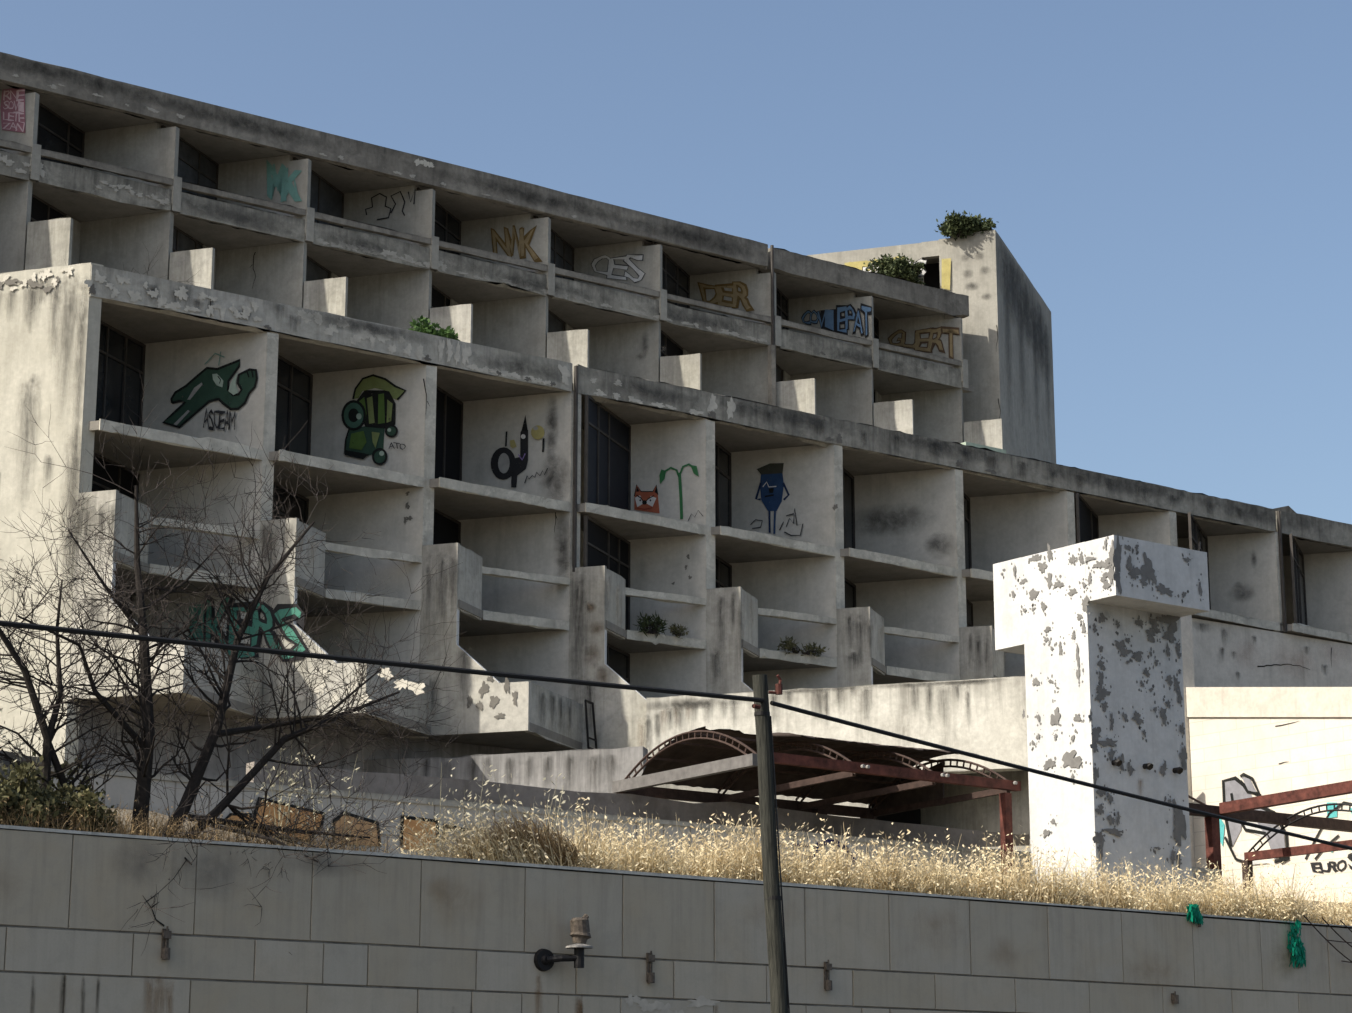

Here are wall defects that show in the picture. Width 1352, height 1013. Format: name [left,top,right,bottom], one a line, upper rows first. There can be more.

water stain [30,277,84,368]
peeling [0,266,271,330]
peeling [467,676,517,719]
water stain [647,700,709,733]
peeling [1000,532,1203,869]